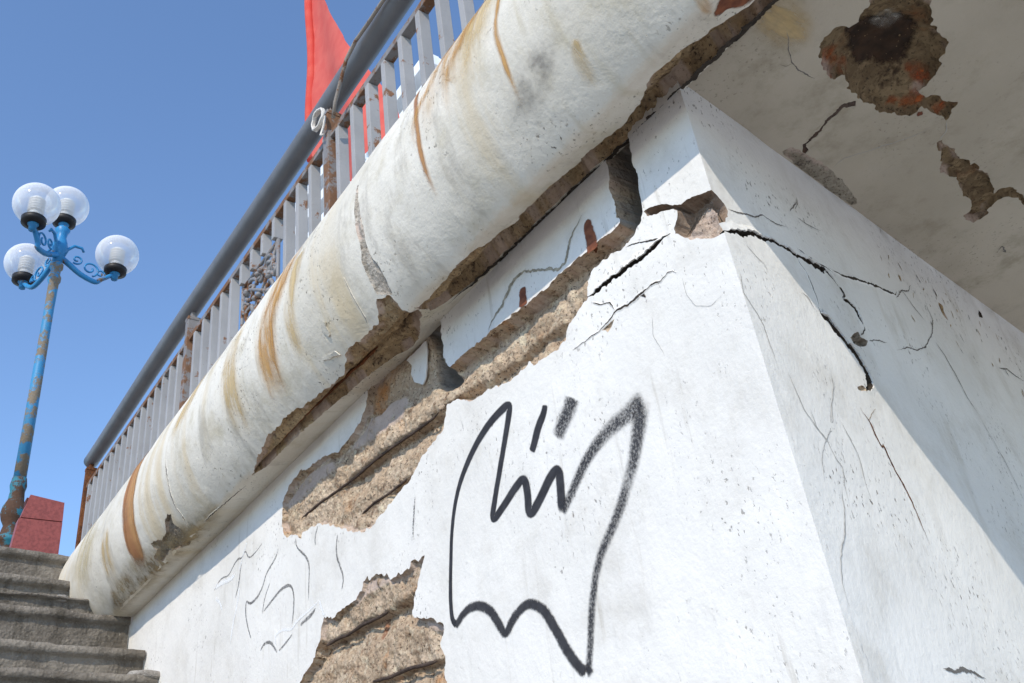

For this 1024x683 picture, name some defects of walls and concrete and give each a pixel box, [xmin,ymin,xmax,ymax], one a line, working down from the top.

corrosion [435,0,512,83]
spalling [818,0,958,120]
corrosion [414,86,429,179]
crack [452,0,779,332]
spalling [937,140,1024,223]
corrosion [259,252,302,380]
spalling [252,0,773,539]
crack [573,229,715,356]
crack [719,202,1020,604]
corrosion [123,449,151,562]
spalling [300,555,447,683]
crack [944,666,984,678]